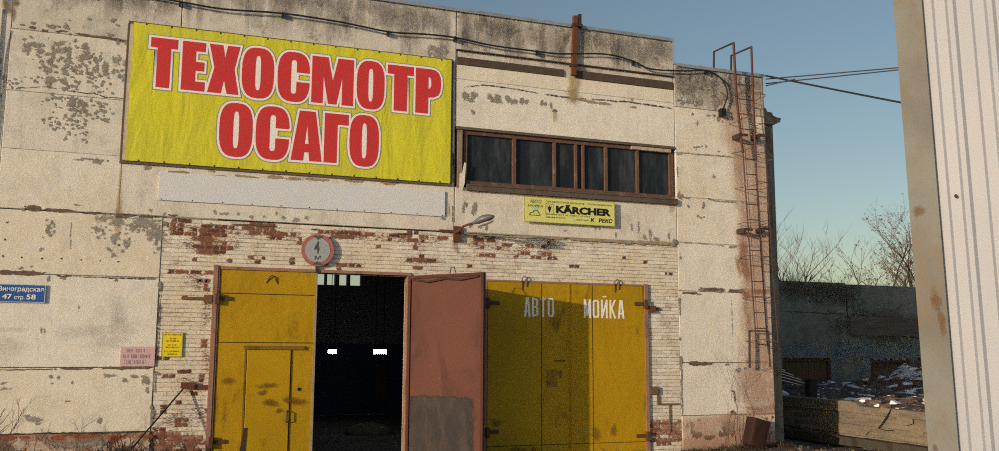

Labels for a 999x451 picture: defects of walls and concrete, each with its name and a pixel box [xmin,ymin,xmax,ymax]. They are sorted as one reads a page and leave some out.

peeling [0,18,127,144]
flaking render [0,209,308,451]
flaking render [650,419,736,446]
corrosion [683,101,775,432]